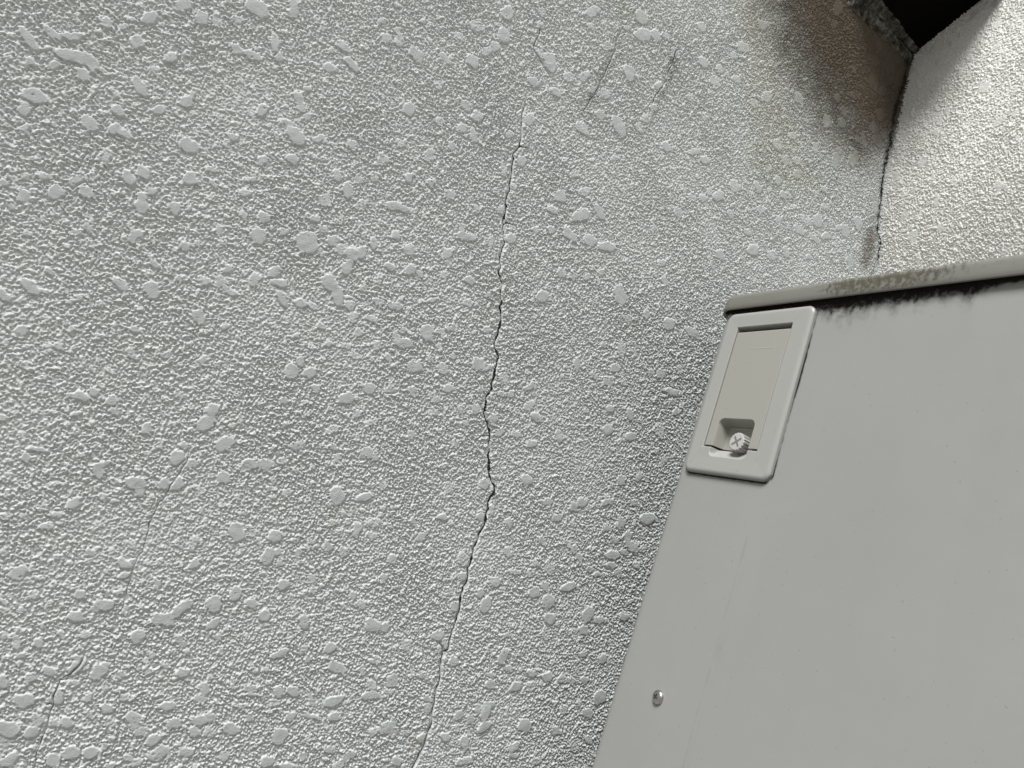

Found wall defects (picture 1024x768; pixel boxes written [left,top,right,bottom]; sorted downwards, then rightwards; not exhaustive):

water stain [781,0,915,150]
crack [412,105,530,768]